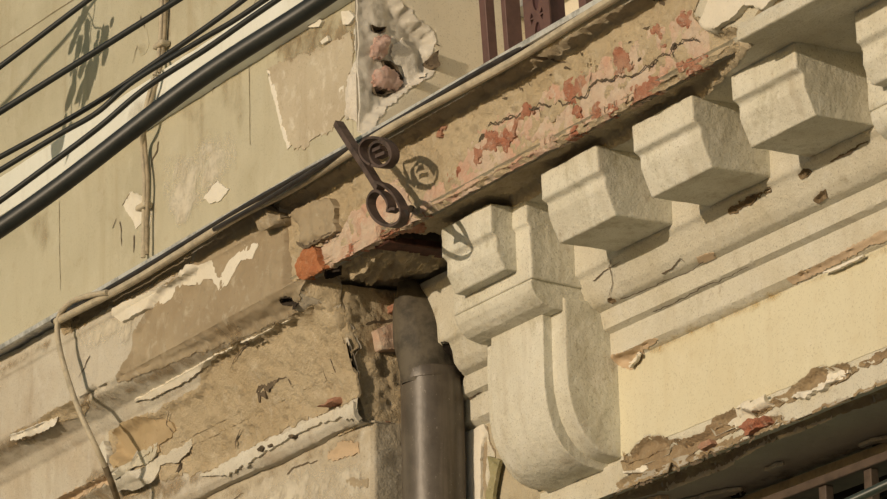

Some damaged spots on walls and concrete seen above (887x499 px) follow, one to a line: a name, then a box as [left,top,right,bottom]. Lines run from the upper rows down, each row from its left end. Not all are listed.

crack [530,55,565,63]
spalling [266,0,784,269]
crack [830,141,868,162]
spalling [122,191,153,229]
peeling [204,180,230,204]
crack [593,255,748,312]
spalling [60,215,447,497]
spalling [611,338,658,370]
spalling [9,401,90,445]
spalling [610,380,887,499]